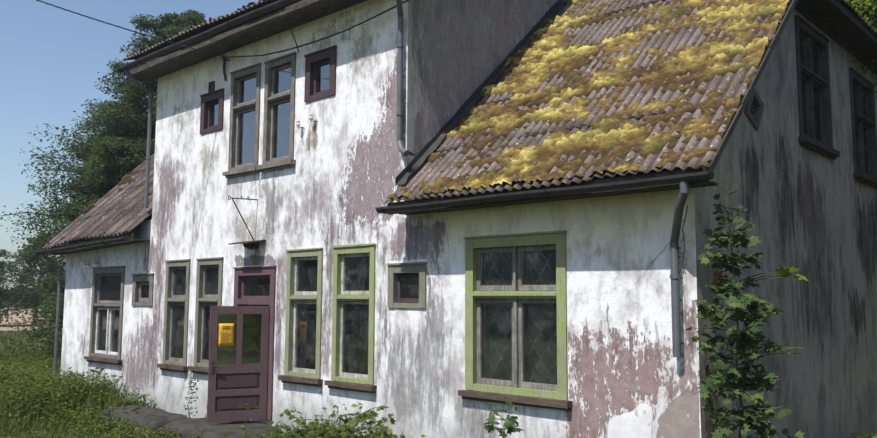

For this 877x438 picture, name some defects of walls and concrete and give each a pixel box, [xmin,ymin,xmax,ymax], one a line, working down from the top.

peeling [337,40,406,236]
leakage [414,0,557,155]
leakage [740,148,764,221]
leakage [776,137,832,329]
leakage [856,186,877,287]
peeling [566,299,700,438]